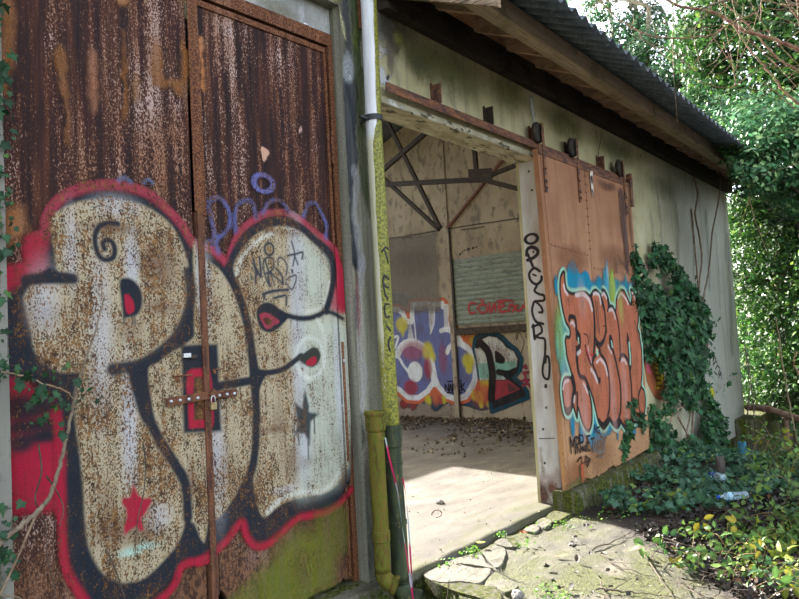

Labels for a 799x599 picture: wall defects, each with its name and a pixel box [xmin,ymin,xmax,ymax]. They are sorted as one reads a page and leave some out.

corrosion [1,0,16,63]
corrosion [55,46,69,132]
corrosion [89,52,98,110]
corrosion [603,182,633,273]